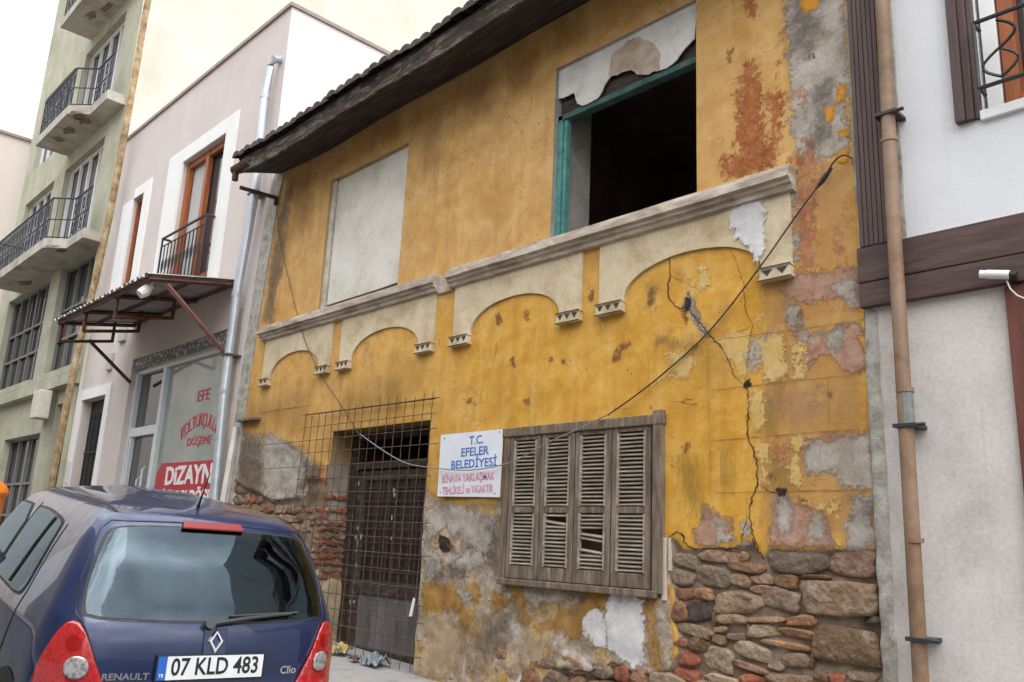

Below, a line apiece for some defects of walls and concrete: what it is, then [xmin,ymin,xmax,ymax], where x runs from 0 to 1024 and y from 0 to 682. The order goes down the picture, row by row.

peeling [609,37,661,76]
spalling [681,0,876,552]
peeling [663,348,697,380]
crack [667,251,788,560]
flaking render [278,449,362,580]
peeling [420,535,664,679]